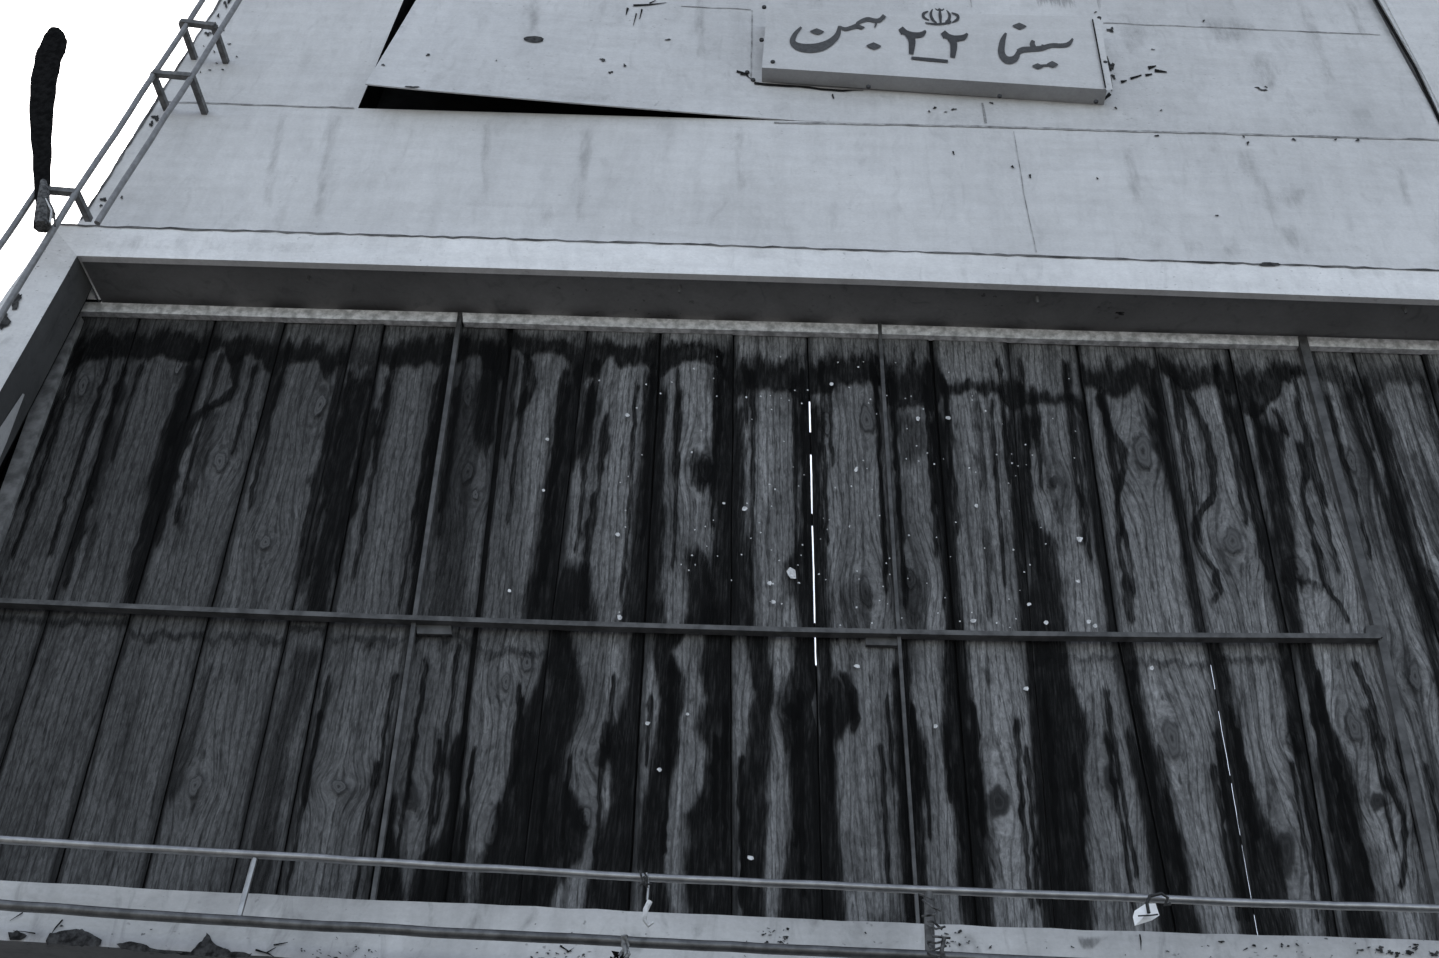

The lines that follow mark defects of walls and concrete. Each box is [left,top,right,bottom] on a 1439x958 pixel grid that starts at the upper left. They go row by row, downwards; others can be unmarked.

damp [0,325,1439,939]
spalling [1355,943,1439,958]